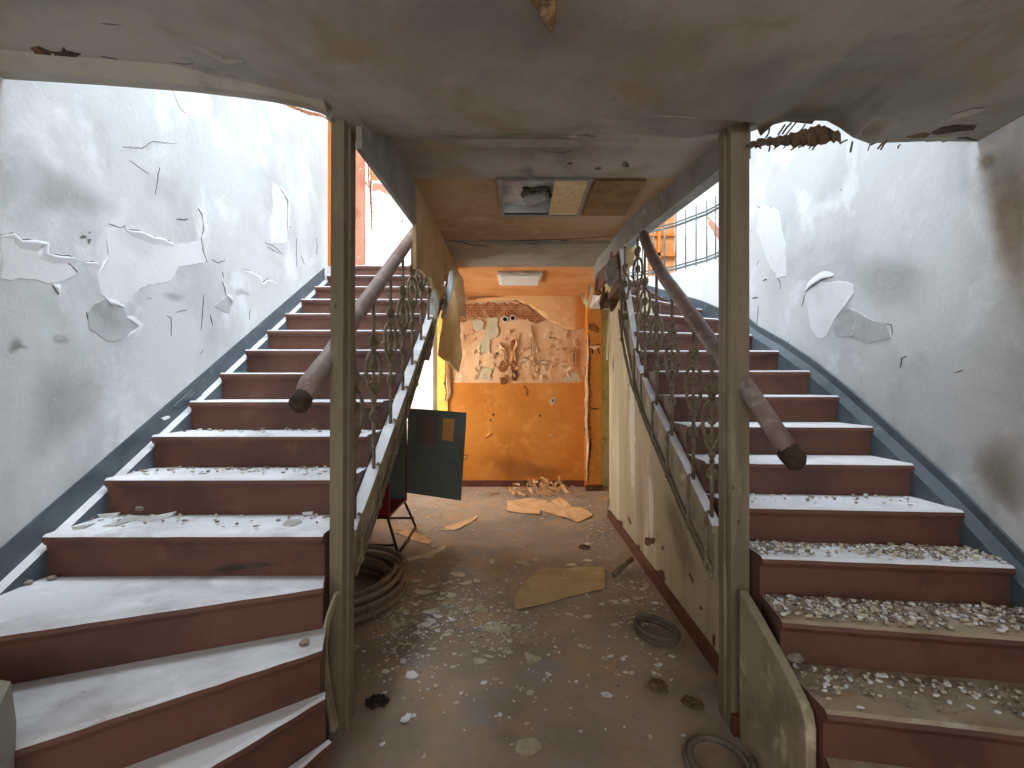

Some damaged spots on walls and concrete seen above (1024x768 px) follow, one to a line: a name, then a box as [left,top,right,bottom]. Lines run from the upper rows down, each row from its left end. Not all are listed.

spalling [30,46,81,57]
crack [126,141,175,194]
peeling [745,121,853,153]
peeling [0,236,77,284]
peeling [87,228,206,342]
crack [108,207,279,336]
peeling [270,182,287,245]
peeling [757,206,787,279]
peeling [805,281,891,344]
flaking render [460,298,599,483]